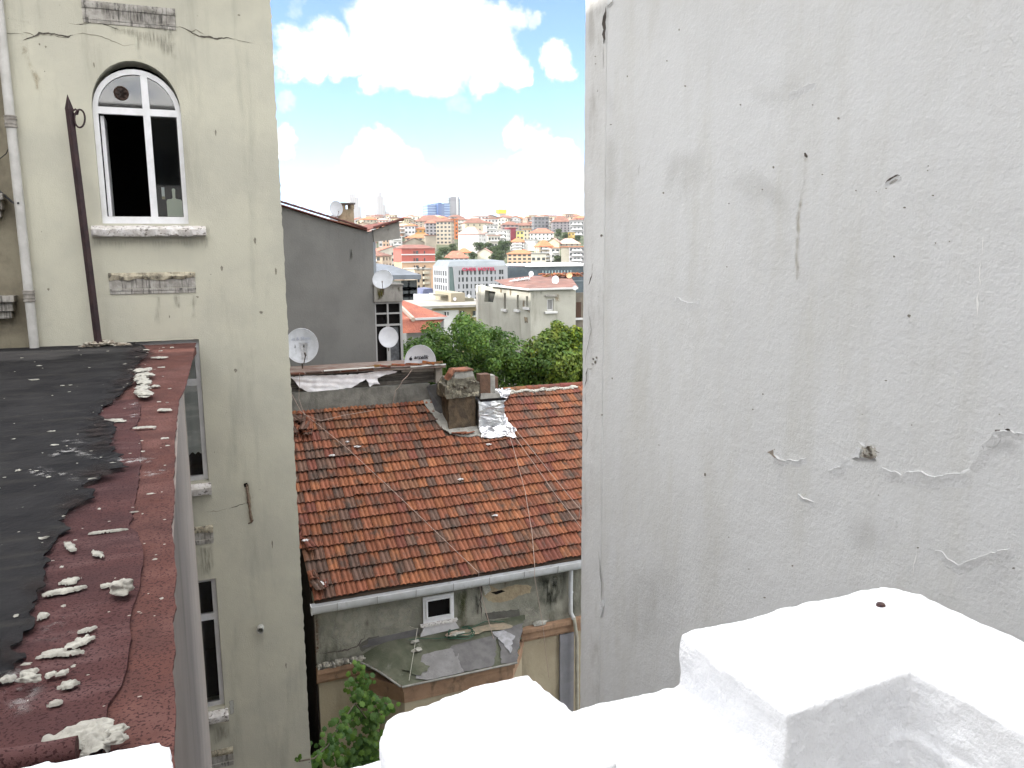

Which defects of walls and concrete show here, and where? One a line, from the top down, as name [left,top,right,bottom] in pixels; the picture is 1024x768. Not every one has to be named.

crack [7,23,133,46]
crack [181,27,249,43]
flaking render [852,441,879,462]
flaking render [482,583,532,620]